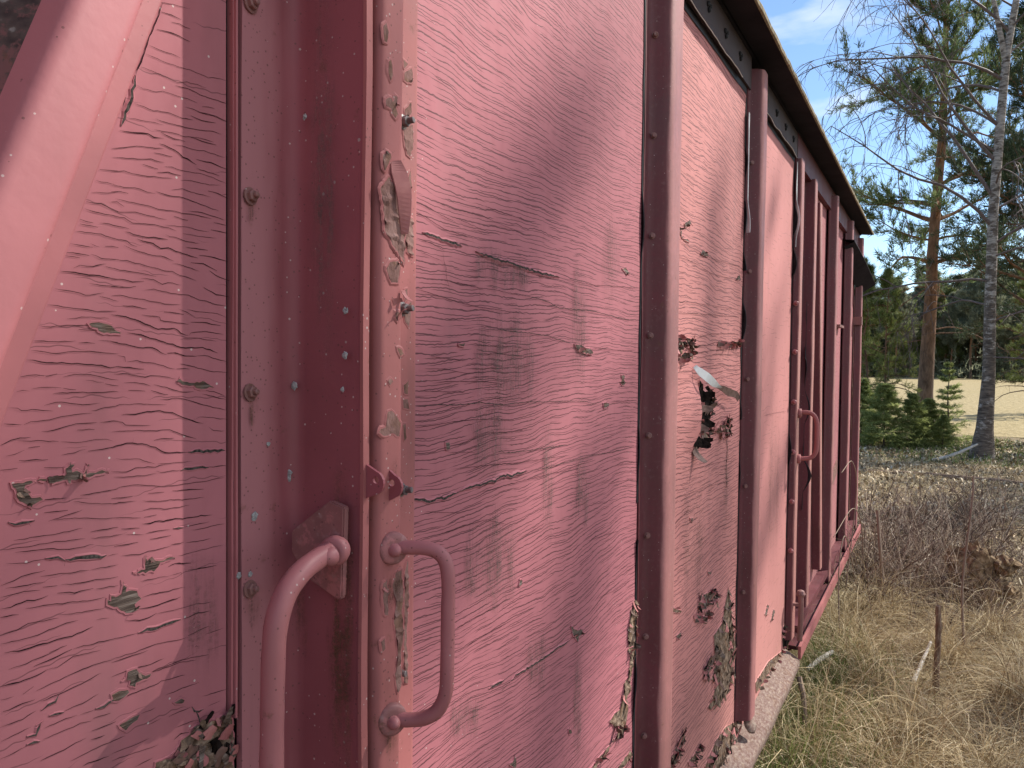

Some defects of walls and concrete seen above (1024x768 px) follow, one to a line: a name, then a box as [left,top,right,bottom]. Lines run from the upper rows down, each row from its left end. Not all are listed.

peeling [378,20,415,329]
crack [0,2,228,765]
crack [414,198,634,536]
peeling [678,334,740,463]
crack [683,302,739,379]
peeling [718,339,745,349]
crack [678,414,731,497]
crack [489,640,570,689]
peeling [694,588,738,711]
peeling [174,704,239,768]
peeling [596,724,632,768]
peeling [671,722,742,768]